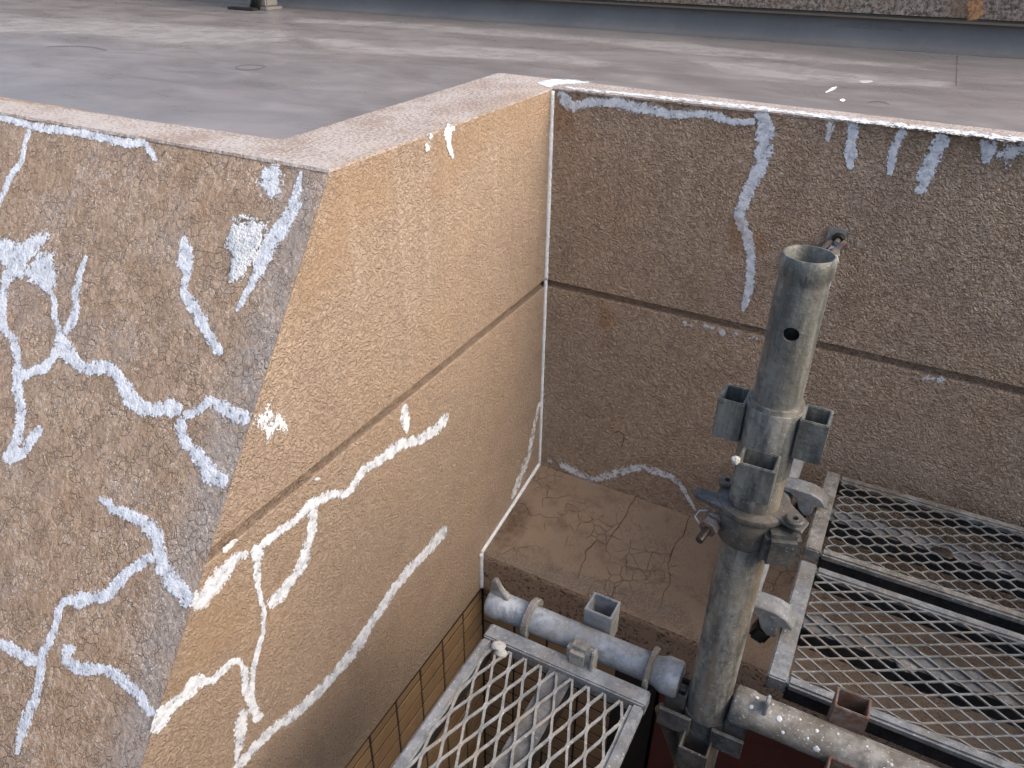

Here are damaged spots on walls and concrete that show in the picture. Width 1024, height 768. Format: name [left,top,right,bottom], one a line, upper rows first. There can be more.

crack [0,115,166,208]
crack [235,165,303,312]
crack [557,91,777,312]
water stain [825,120,860,170]
water stain [886,129,908,176]
water stain [914,133,952,195]
water stain [979,139,998,164]
crack [0,231,250,489]
crack [511,397,697,611]
crack [0,413,449,768]